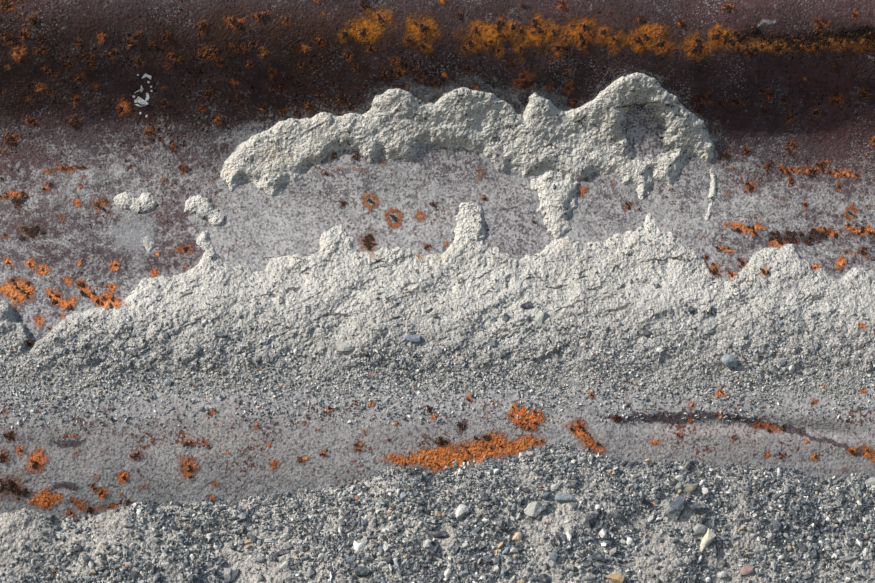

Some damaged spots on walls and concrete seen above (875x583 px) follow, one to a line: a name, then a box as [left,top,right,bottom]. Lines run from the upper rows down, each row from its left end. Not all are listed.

rust [456,12,565,90]
rust [686,17,875,57]
rust [361,234,377,250]
rust [362,193,402,228]
rust [724,222,767,236]
rust [815,202,875,238]
rust [0,259,121,319]
rust [0,431,47,471]
rust [181,439,210,479]
rust [384,402,545,473]
rust [569,418,605,454]
rust [0,471,133,518]